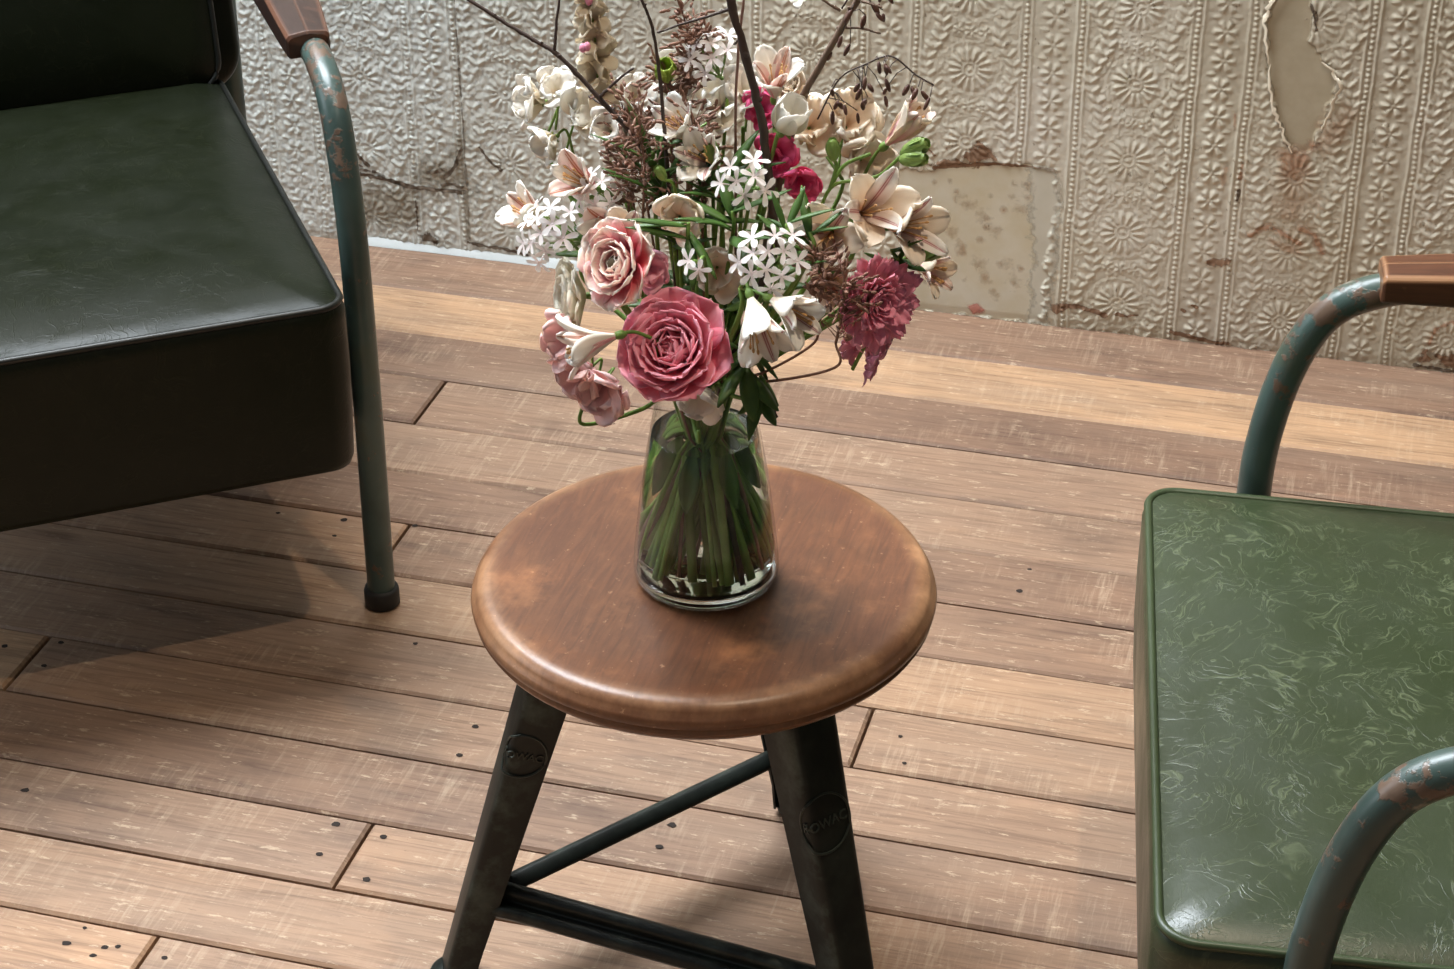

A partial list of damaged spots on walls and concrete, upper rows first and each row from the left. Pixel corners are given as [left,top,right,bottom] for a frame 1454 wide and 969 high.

crack [357,0,530,256]
peeling [1262,0,1343,153]
spalling [897,141,1139,326]